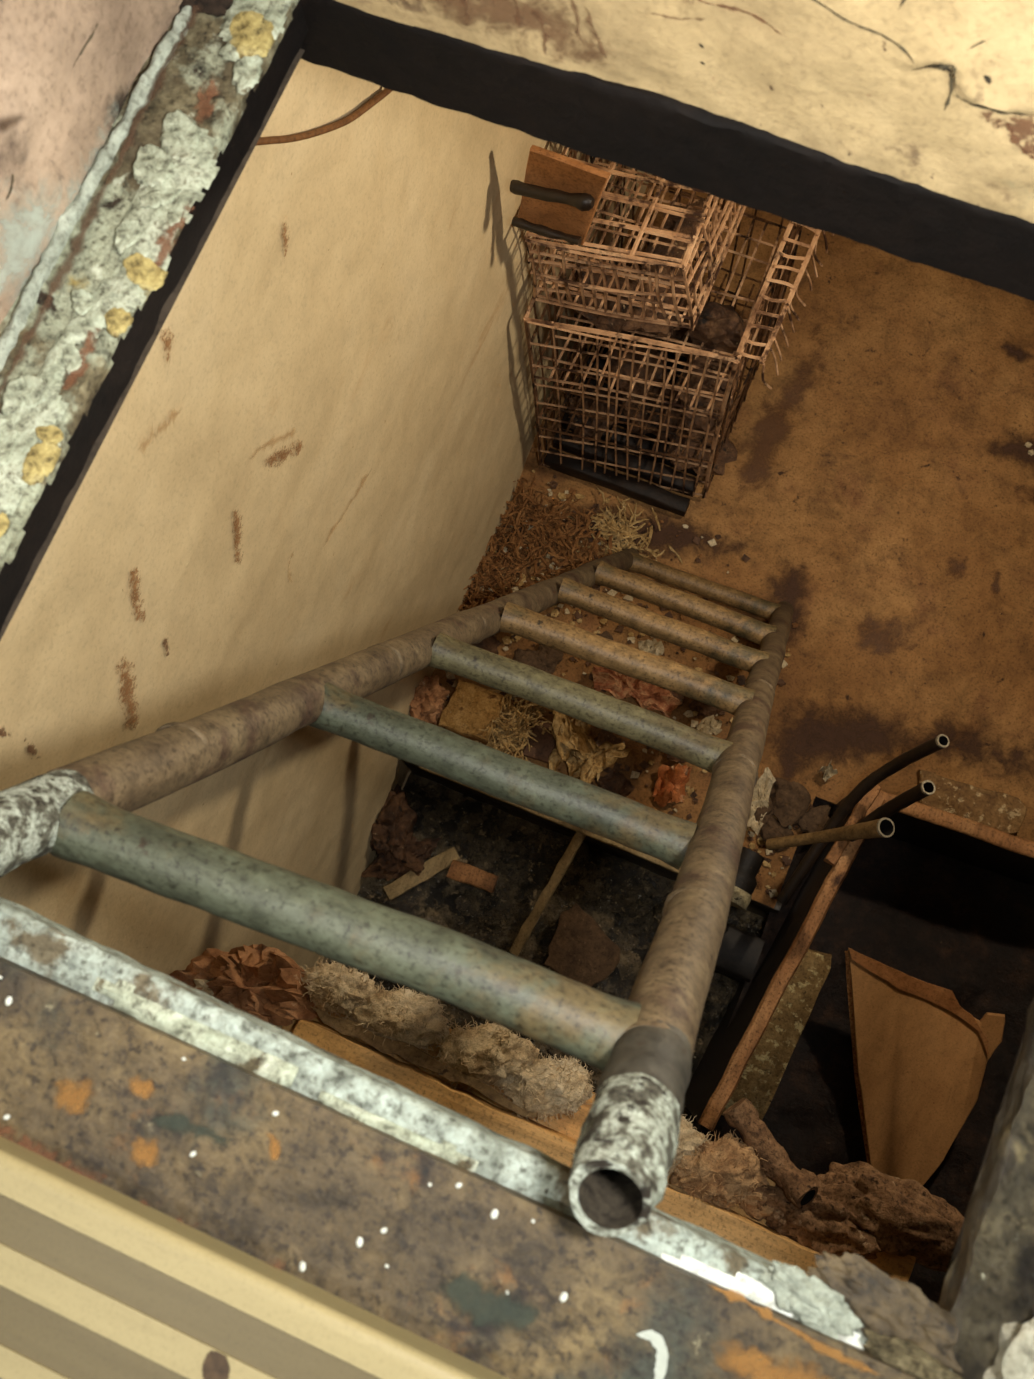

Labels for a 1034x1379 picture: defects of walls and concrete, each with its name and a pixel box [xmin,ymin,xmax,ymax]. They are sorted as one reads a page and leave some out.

peeling [218,0,293,95]
water stain [435,0,606,62]
crack [813,0,1029,115]
peeling [0,109,220,538]
corrosion [268,442,303,467]
corrosion [232,510,243,562]
corrosion [130,568,145,621]
corrosion [116,658,139,728]
corrosion [57,1081,90,1113]
corrosion [131,1081,153,1098]
corrosion [133,1139,158,1166]